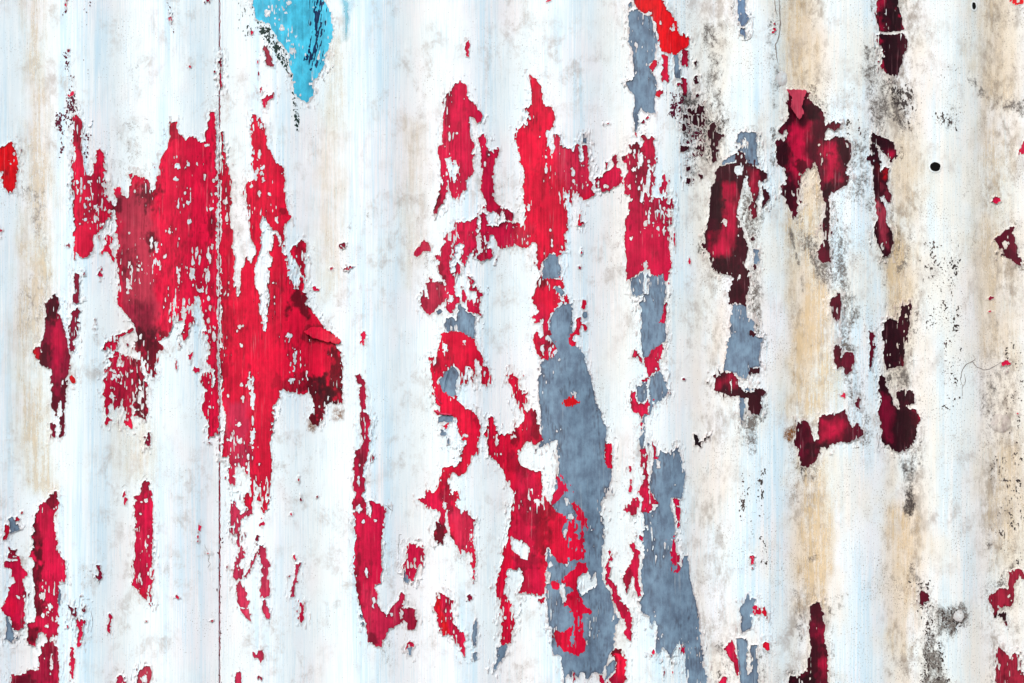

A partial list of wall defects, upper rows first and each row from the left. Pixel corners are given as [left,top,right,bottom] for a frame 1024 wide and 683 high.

peeling [871,0,914,84]
peeling [863,126,903,263]
peeling [30,266,88,445]
peeling [64,0,857,683]
peeling [788,287,927,473]
peeling [0,485,116,683]